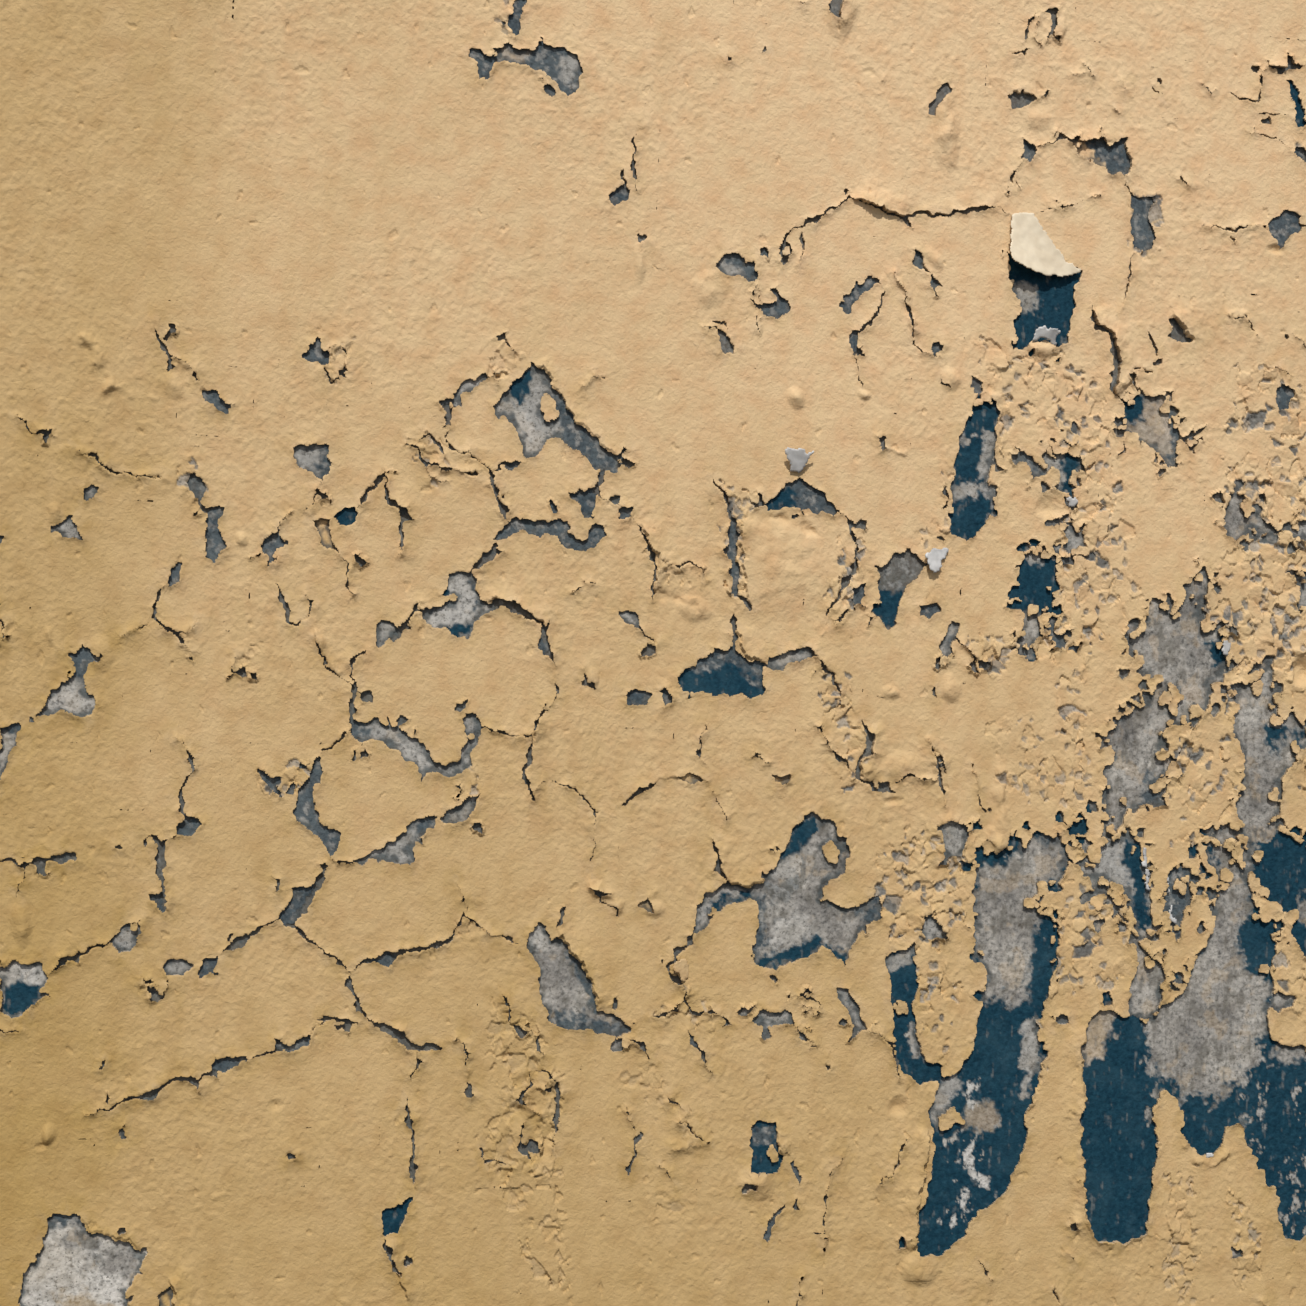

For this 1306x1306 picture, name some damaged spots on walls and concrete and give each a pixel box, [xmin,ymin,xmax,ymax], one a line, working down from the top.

peeling [468,0,583,98]
crack [765,188,1005,271]
peeling [1007,89,1163,300]
crack [17,414,227,661]
peeling [250,443,412,597]
peeling [402,332,636,551]
crack [115,735,202,919]
crack [337,603,423,724]
crack [445,424,727,898]
peeling [449,191,1306,1306]
crack [82,858,518,1278]
peeling [18,1213,148,1306]